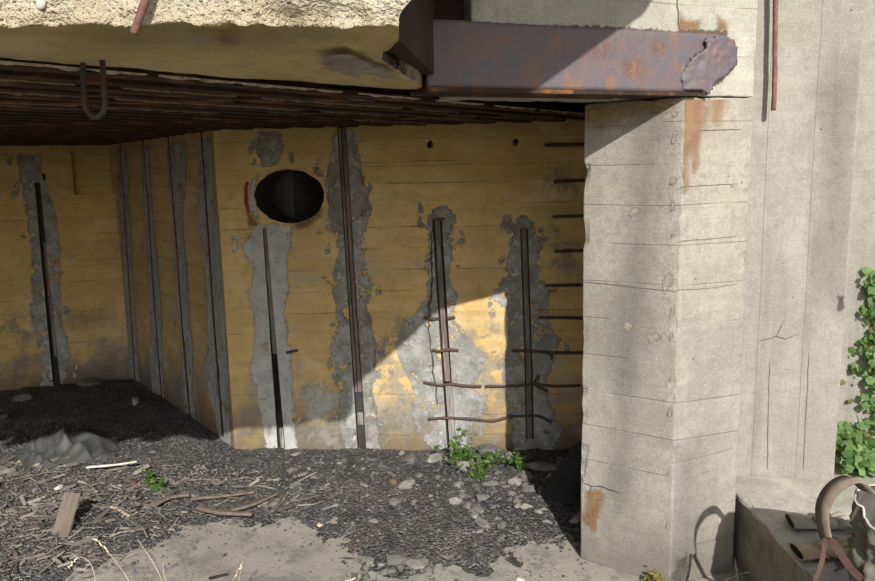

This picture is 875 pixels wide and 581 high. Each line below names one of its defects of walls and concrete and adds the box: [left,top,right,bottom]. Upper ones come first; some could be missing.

rust [547,18,728,36]
rust [684,99,721,188]
peeling [6,154,78,387]
peeling [167,138,231,446]
peeling [231,129,583,450]
rust [584,491,602,532]